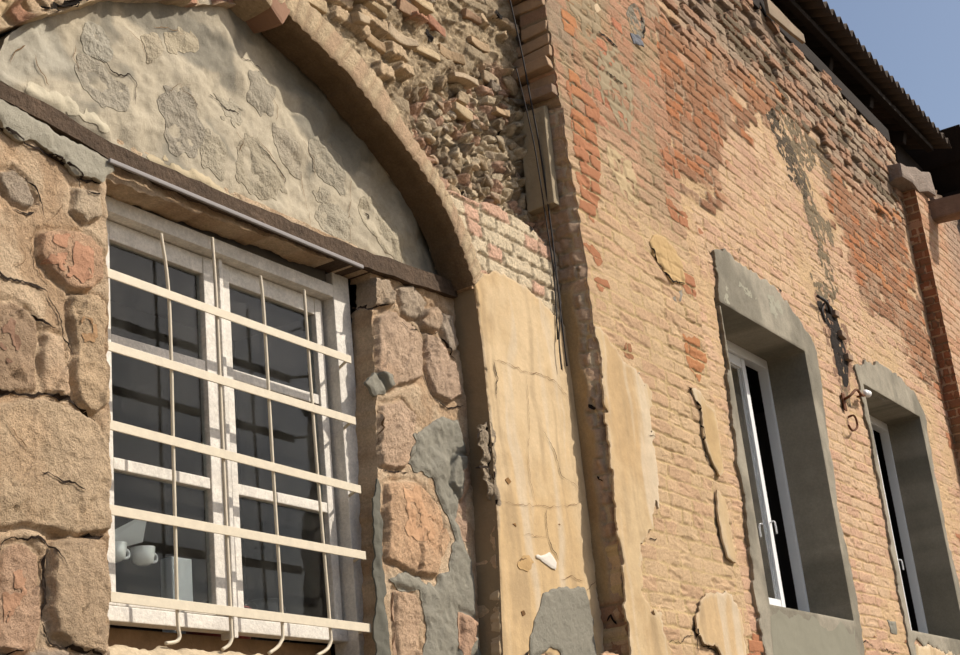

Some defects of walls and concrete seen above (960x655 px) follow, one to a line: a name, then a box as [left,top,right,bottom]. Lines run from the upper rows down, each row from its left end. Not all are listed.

spalling [74,21,131,112]
spalling [140,26,199,64]
spalling [230,0,290,33]
spalling [307,0,327,14]
spalling [352,0,500,90]
spalling [491,106,510,119]
spalling [157,70,407,263]
flaking render [566,68,601,224]
peeling [649,234,696,297]
spalling [476,422,511,506]
peeling [517,552,557,572]
spalling [457,612,478,655]